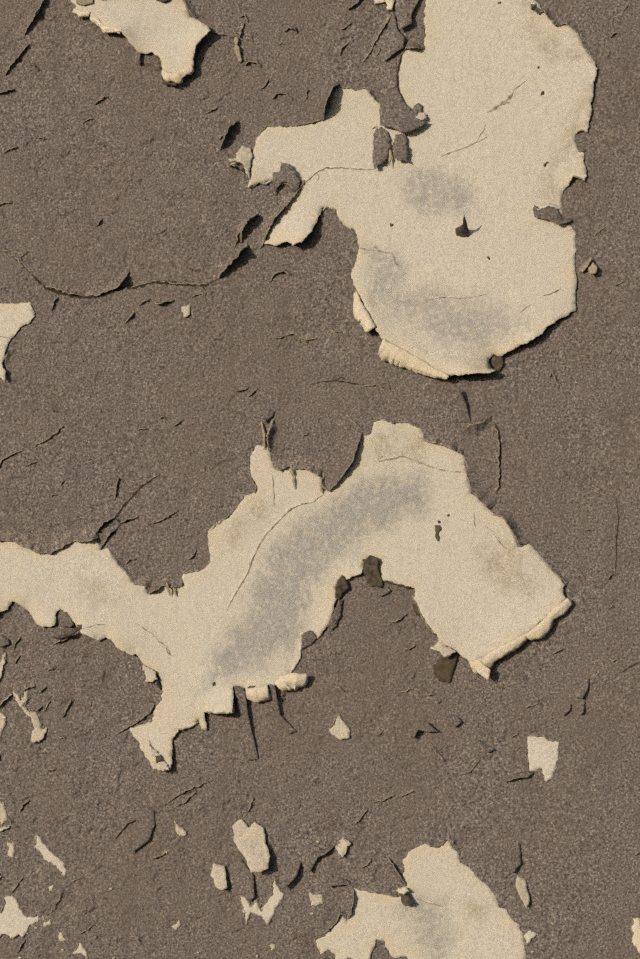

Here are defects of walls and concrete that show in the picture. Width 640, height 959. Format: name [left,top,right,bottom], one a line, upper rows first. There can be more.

peeling [70,0,211,86]
peeling [217,0,601,380]
peeling [0,302,35,381]
peeling [153,297,191,317]
crack [226,476,324,611]
peeling [0,408,572,772]
peeling [525,730,560,783]
peeling [0,799,24,861]
peeling [0,876,89,959]
peeling [34,832,67,877]
peeling [210,797,352,927]
peeling [314,838,537,959]